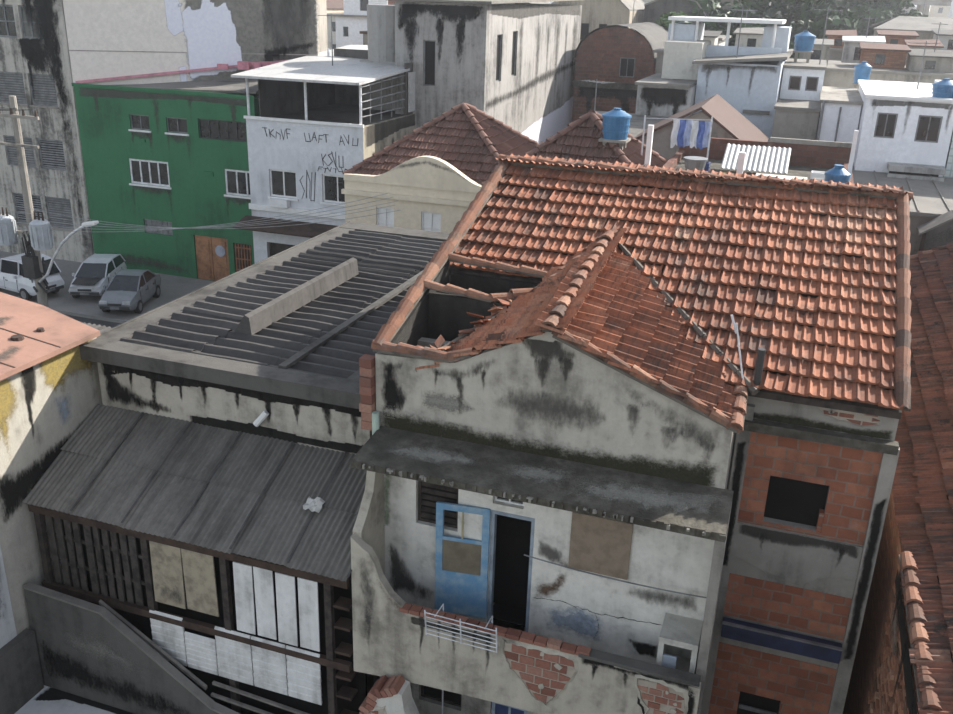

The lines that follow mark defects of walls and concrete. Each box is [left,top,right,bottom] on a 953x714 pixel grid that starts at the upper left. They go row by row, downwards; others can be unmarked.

peeling [185,0,276,81]
damp [265,43,313,62]
peeling [303,0,318,56]
damp [398,4,483,63]
damp [18,0,83,218]
damp [102,363,361,438]
damp [382,364,405,410]
damp [435,370,462,400]
damp [526,339,574,383]
damp [0,436,71,520]
flaking render [501,638,579,706]
flaking render [634,675,689,714]